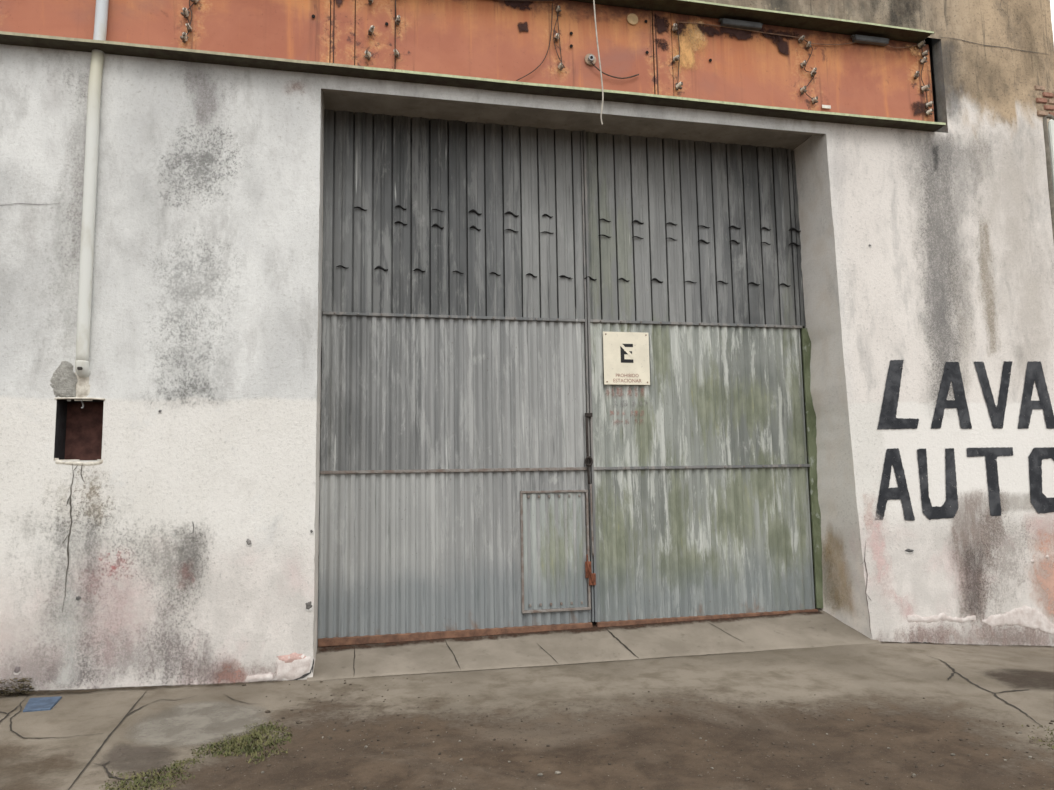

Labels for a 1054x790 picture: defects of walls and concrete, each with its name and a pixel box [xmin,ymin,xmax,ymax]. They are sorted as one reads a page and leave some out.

corrosion [505,1,533,32]
corrosion [654,15,799,68]
corrosion [912,101,931,117]
crack [61,463,84,612]
crack [864,545,930,644]
flaking render [217,652,314,683]